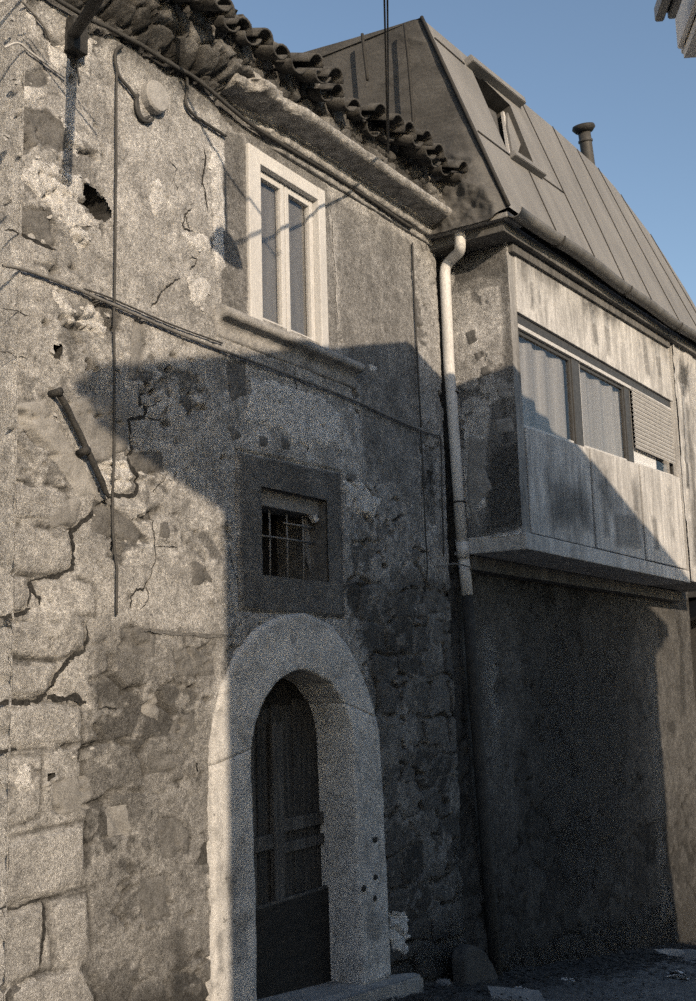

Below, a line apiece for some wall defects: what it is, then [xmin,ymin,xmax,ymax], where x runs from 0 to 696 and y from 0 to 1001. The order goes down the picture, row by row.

peeling [3,38,118,251]
crack [150,149,214,313]
crack [0,391,178,620]
damp [679,365,696,485]
crack [0,623,118,709]